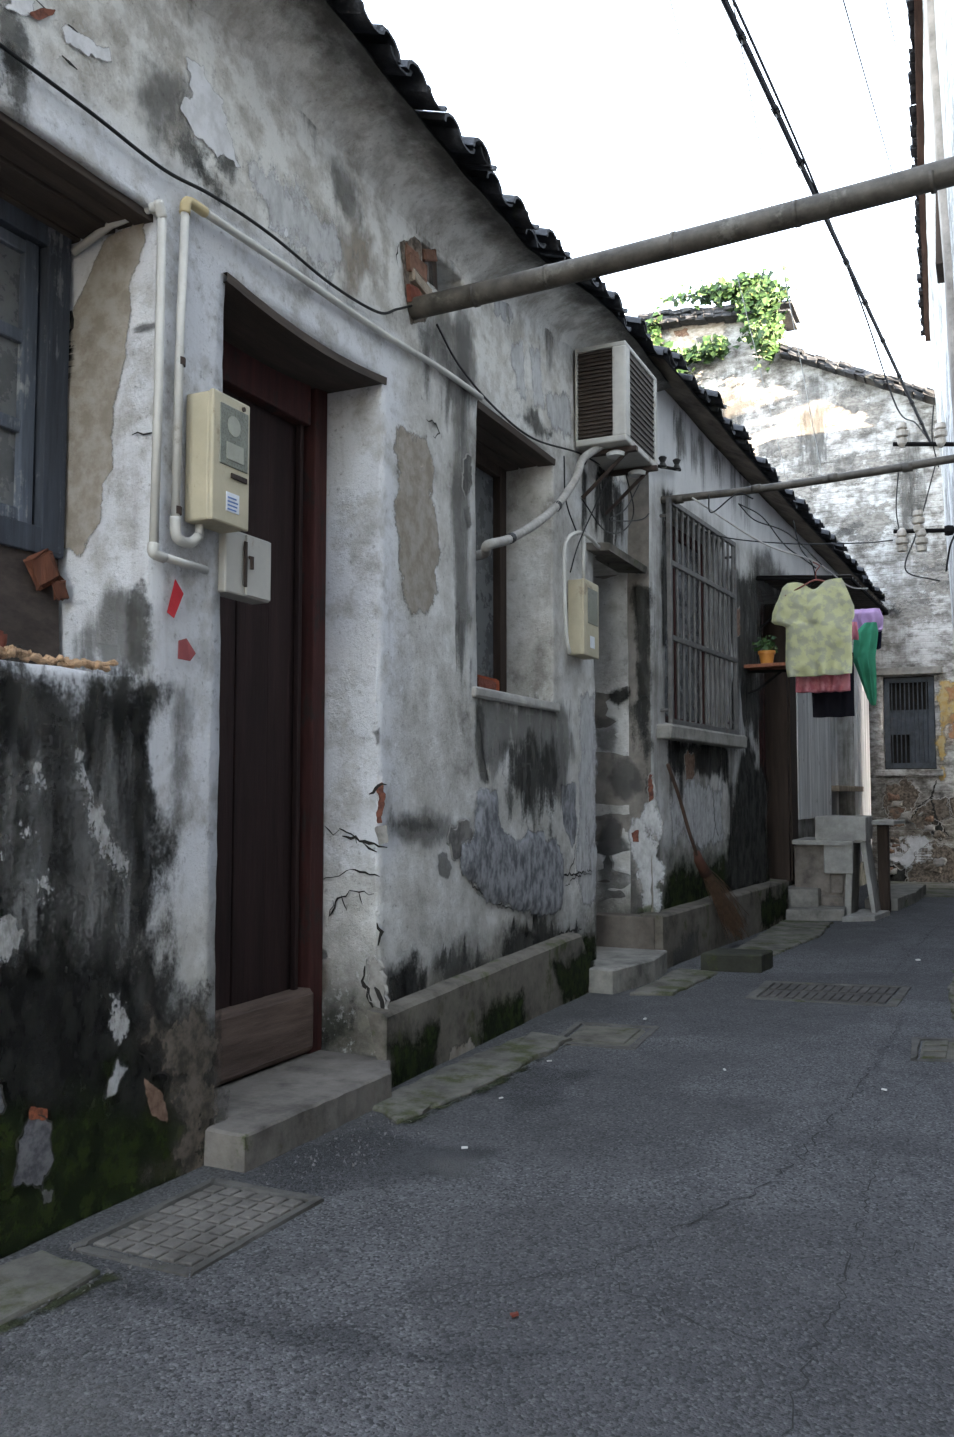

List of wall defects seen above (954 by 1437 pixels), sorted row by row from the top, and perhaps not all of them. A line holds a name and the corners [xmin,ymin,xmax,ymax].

flaking render [6,0,112,70]
water stain [139,71,186,132]
water stain [173,139,235,205]
spalling [400,236,438,325]
flaking render [64,223,145,557]
water stain [0,579,204,1178]
crack [324,826,387,946]
flaking render [628,750,724,913]
spalling [881,777,954,883]
spalling [11,1106,55,1205]